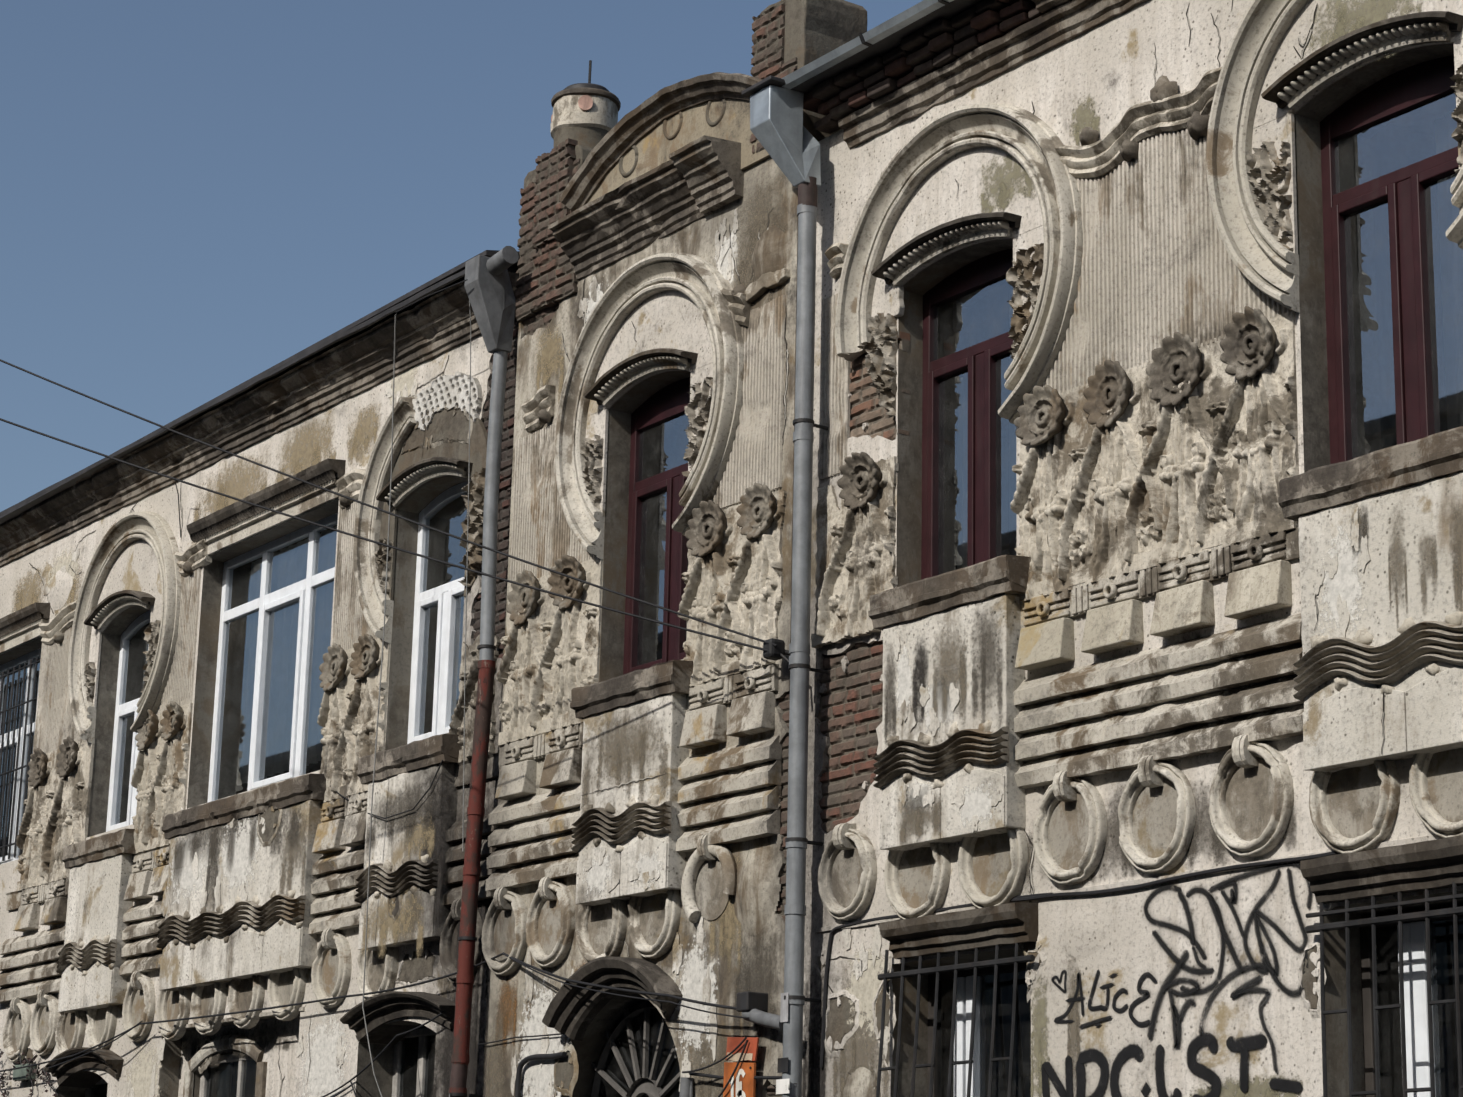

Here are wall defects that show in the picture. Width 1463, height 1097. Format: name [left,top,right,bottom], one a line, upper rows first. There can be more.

crack [1154,0,1233,83]
flaking render [848,352,910,441]
spalling [385,302,560,659]
damp [1353,513,1368,552]
damp [1388,510,1463,621]
flaking render [817,631,960,833]
damp [885,614,1002,743]
damp [174,807,306,910]
damp [900,796,940,843]
peeling [814,921,896,1076]